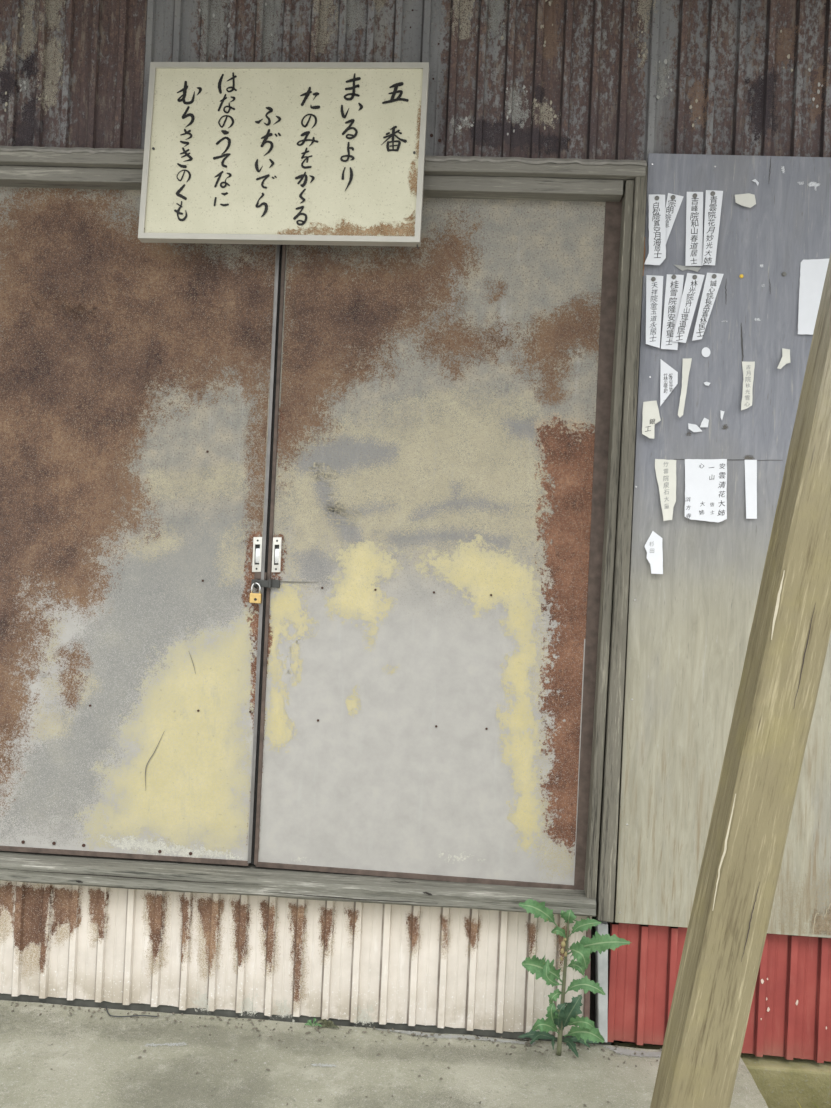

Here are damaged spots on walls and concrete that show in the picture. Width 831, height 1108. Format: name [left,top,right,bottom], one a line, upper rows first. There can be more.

peeling [0,0,65,115]
peeling [310,0,367,56]
peeling [450,0,511,42]
peeling [635,0,674,101]
corrosion [407,105,421,196]
peeling [450,115,475,133]
peeling [504,82,558,135]
corrosion [0,187,602,859]
corrosion [0,881,112,981]
corrosion [140,891,362,1012]
corrosion [405,911,424,960]
corrosion [437,914,483,959]